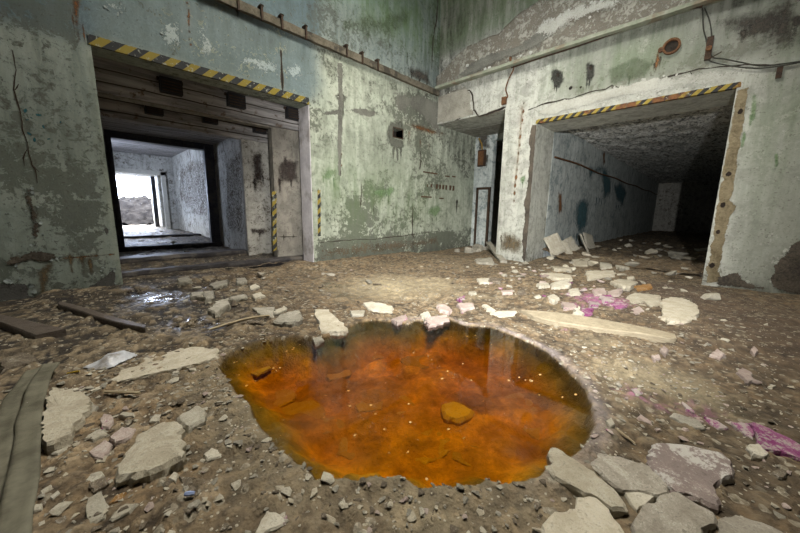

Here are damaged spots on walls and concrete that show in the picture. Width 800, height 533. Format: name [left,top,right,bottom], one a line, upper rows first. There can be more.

peeling [160,22,183,50]
spalling [437,0,631,123]
damp [551,69,564,91]
damp [586,63,594,87]
crack [12,50,39,183]
damp [253,155,264,192]
damp [278,157,297,192]
spalling [555,69,800,294]